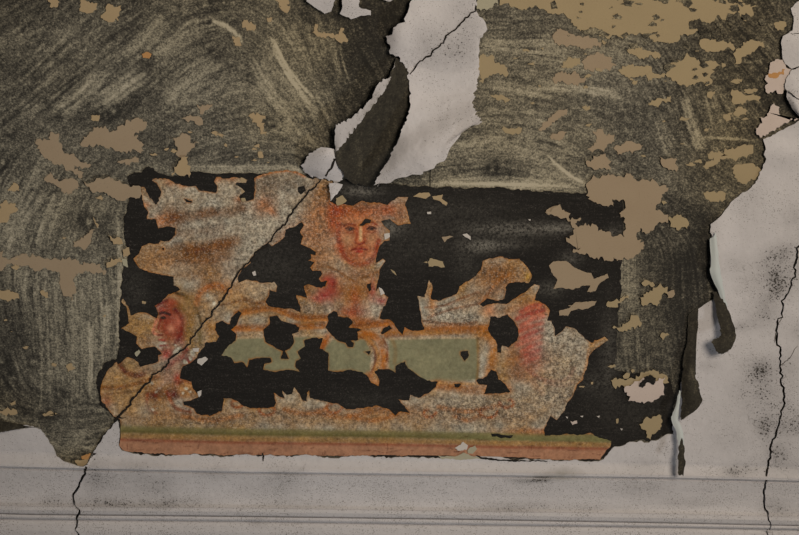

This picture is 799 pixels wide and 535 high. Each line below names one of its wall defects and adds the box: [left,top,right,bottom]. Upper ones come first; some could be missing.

crack [410,6,477,74]
peeling [0,0,411,466]
peeling [335,0,799,410]
leakage [748,243,798,326]
crack [72,159,336,535]
peeling [439,442,480,460]
peeling [634,414,671,442]
leakage [725,358,799,475]
crack [763,245,799,534]